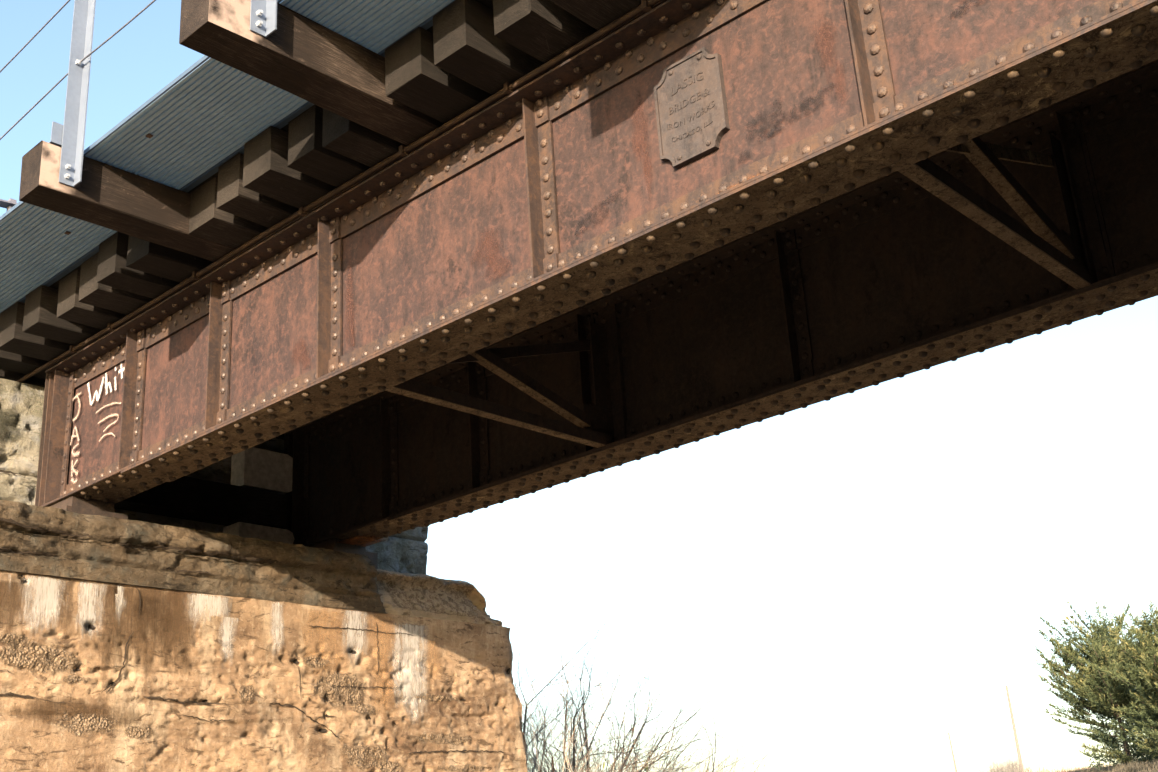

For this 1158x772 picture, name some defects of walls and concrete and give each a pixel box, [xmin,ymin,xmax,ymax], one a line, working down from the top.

crack [0,518,279,574]
water stain [0,575,238,667]
crack [102,586,141,693]
water stain [271,602,283,649]
crack [307,623,413,689]
crack [0,670,64,703]
water stain [18,700,138,726]
crack [145,696,240,722]
crack [269,667,339,738]